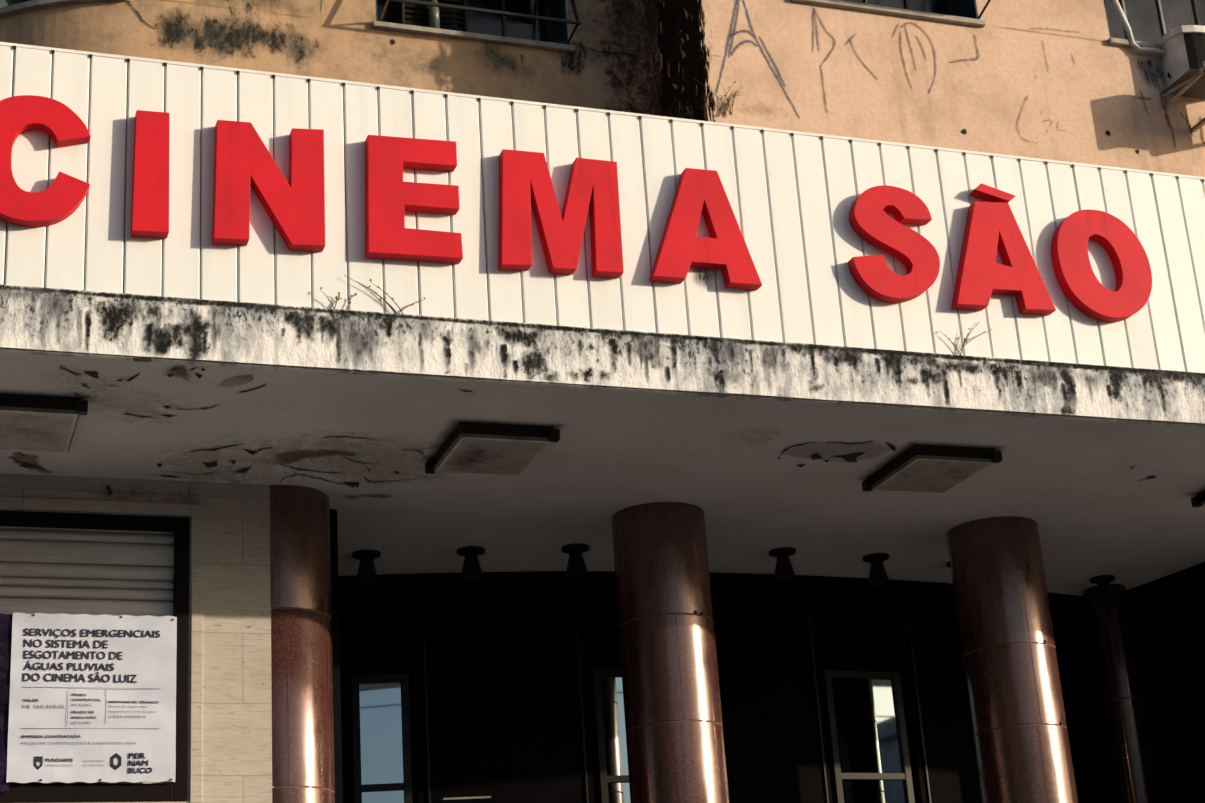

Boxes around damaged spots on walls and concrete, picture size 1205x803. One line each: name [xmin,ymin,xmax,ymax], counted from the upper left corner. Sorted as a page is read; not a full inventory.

water stain [155,0,318,64]
water stain [695,268,712,285]
water stain [0,285,1205,425]
peeling [9,452,51,473]
peeling [157,444,273,482]
peeling [778,441,896,468]